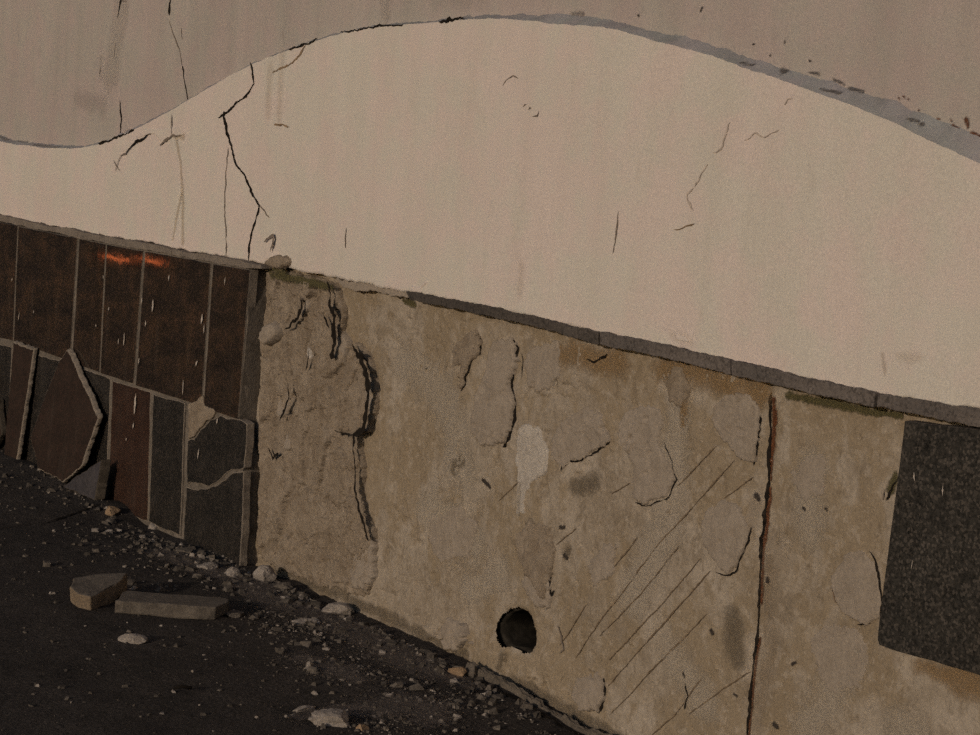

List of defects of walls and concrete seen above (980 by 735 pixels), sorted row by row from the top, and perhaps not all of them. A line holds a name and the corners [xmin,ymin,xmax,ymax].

crack [168,0,188,100]
crack [98,107,134,145]
spalling [256,234,380,597]
crack [560,442,609,471]
crack [635,441,677,506]
corrosion [760,398,777,604]
crack [716,392,772,735]
spalling [496,607,537,654]
crack [546,577,564,653]
crack [467,675,582,735]
corrosion [748,637,761,735]